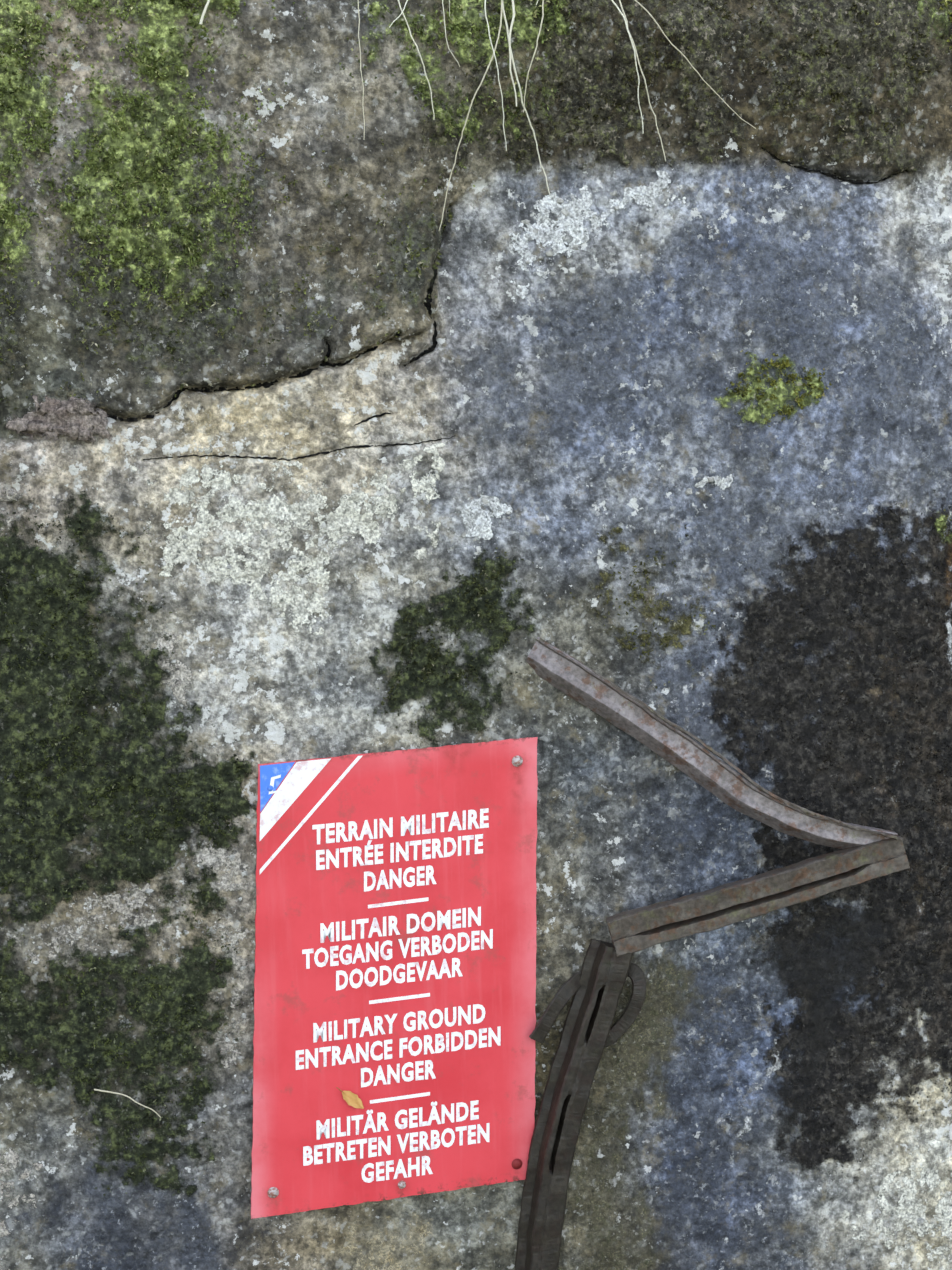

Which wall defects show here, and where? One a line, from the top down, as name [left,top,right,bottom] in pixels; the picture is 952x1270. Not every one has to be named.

crack [107,211,448,422]
crack [142,412,456,461]